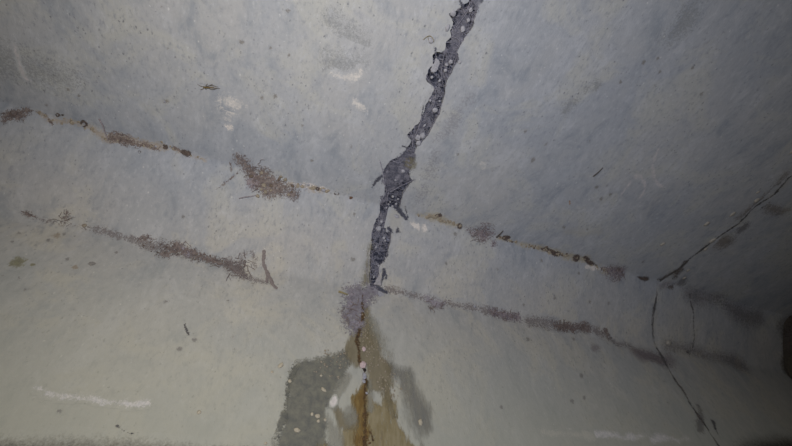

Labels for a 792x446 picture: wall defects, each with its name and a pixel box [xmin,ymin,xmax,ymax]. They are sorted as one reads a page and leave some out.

water stain [0,350,350,446]
crack [354,295,374,446]
corrosion [334,324,413,446]
water stain [338,282,430,433]
water stain [741,432,792,446]